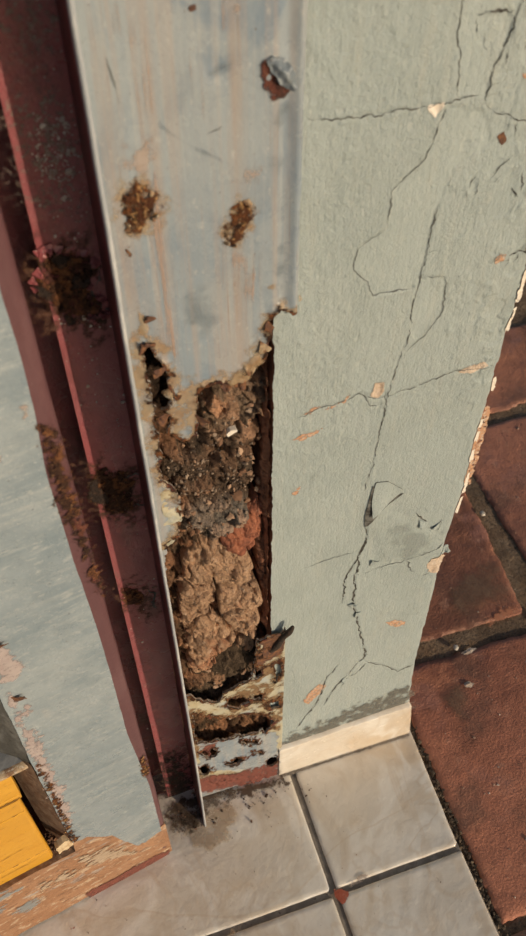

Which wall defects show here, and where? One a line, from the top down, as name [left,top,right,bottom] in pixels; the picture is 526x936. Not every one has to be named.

rust [24,232,111,347]
rust [116,141,301,551]
crack [301,0,526,491]
peeling [0,647,73,825]
rust [35,424,156,623]
spalling [144,348,271,774]
rust [139,625,295,799]
crack [298,528,443,726]